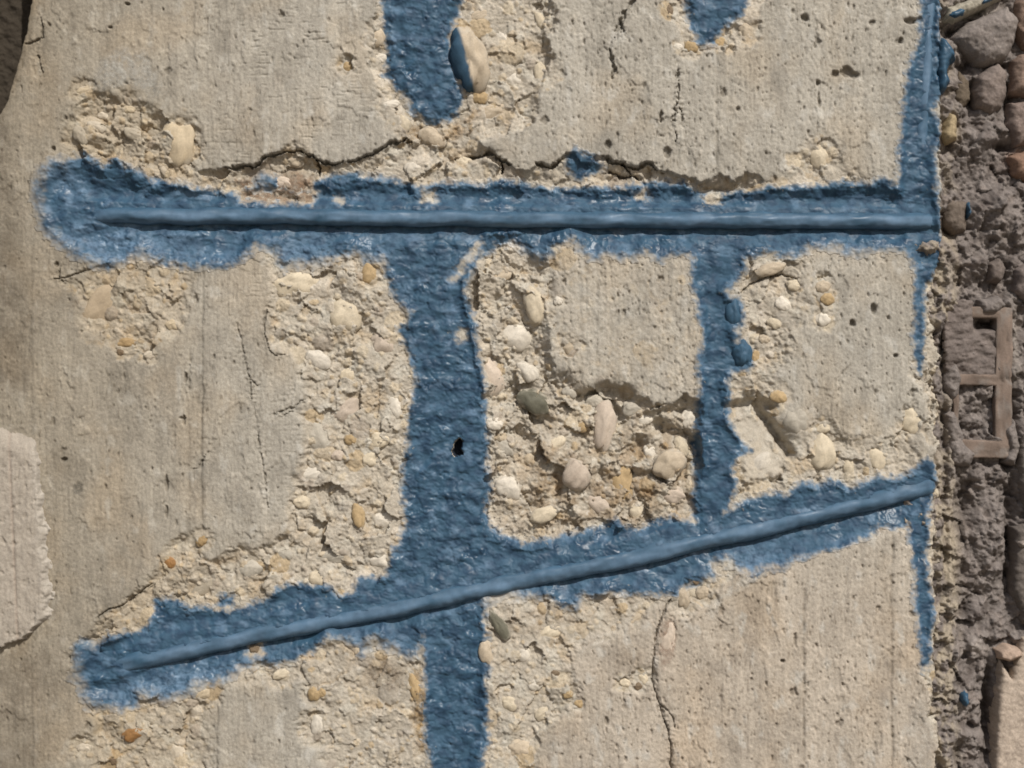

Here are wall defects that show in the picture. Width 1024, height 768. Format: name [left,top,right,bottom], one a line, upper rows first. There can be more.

crack [227,138,413,175]
spalling [65,0,870,203]
crack [468,150,563,175]
crack [606,158,658,180]
spalling [64,261,200,359]
spalling [85,254,413,639]
spalling [467,245,695,541]
spalling [729,252,940,597]
spalling [76,641,430,768]
crack [651,597,677,768]
spalling [926,613,941,746]